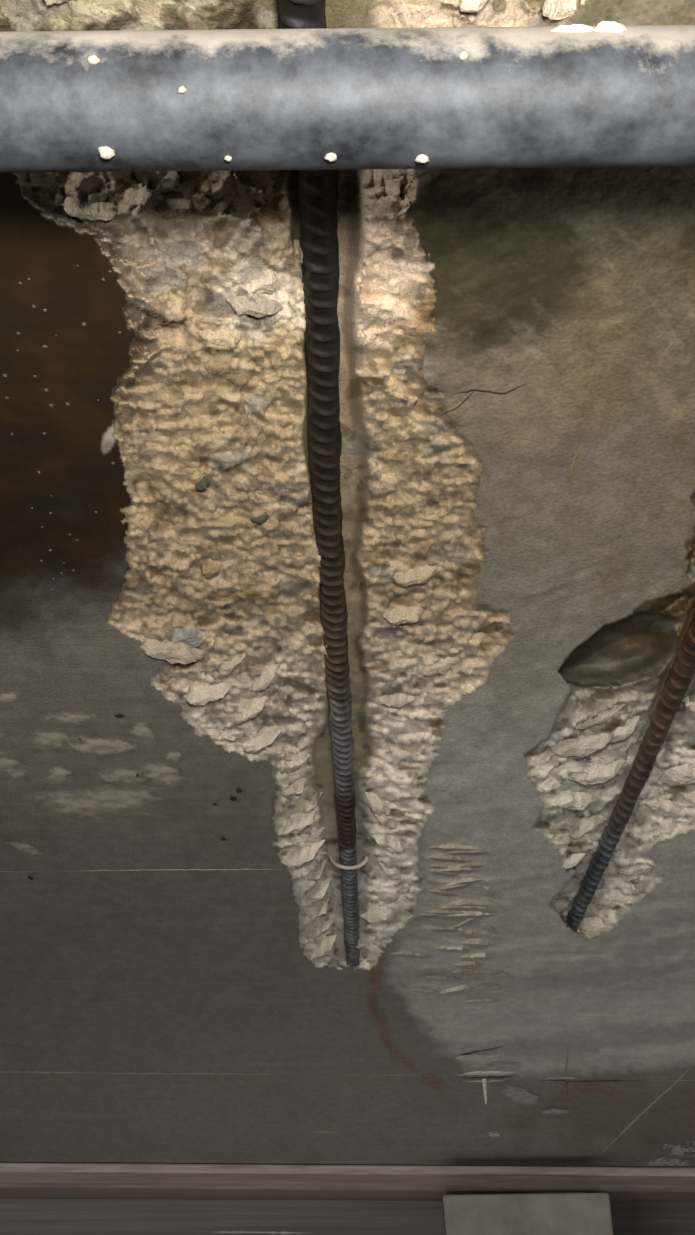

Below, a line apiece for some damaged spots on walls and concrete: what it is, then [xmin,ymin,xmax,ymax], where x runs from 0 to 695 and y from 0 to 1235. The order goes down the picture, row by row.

spalling [0,0,588,32]
spalling [12,169,516,971]
leakage [0,734,26,778]
leakage [33,713,154,755]
leakage [35,752,183,818]
spalling [525,530,695,939]